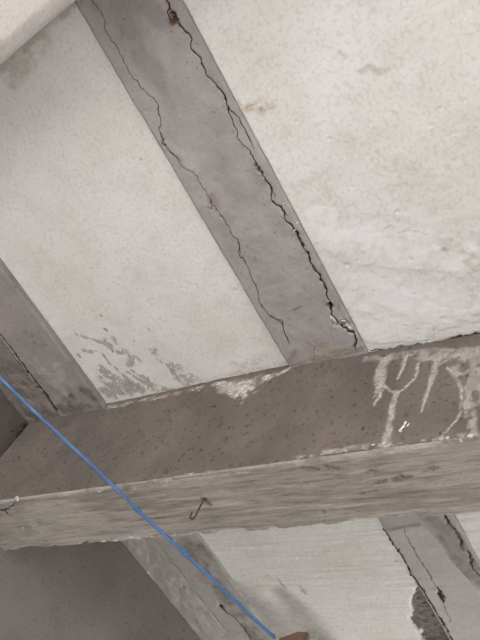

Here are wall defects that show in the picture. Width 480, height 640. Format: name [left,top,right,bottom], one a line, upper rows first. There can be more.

crack [92,0,303,344]
crack [166,0,426,351]
crack [0,334,58,410]
crack [383,528,453,640]
spalling [411,587,449,640]
crack [444,515,480,577]